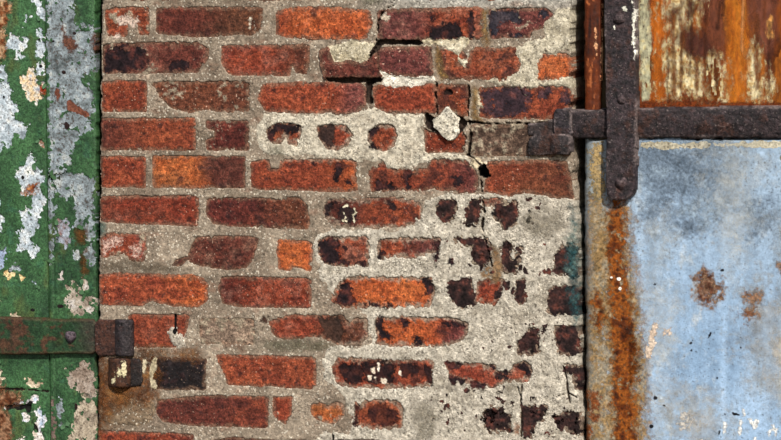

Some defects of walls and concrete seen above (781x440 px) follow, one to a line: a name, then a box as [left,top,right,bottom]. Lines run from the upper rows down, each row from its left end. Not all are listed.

spalling [167,59,192,72]
peeling [638,0,729,106]
corrosion [640,0,781,108]
peeling [746,43,775,104]
peeling [0,0,149,316]
corrosion [586,196,651,440]
corrosion [690,266,726,310]
corrosion [741,288,764,321]
peeling [14,360,99,440]